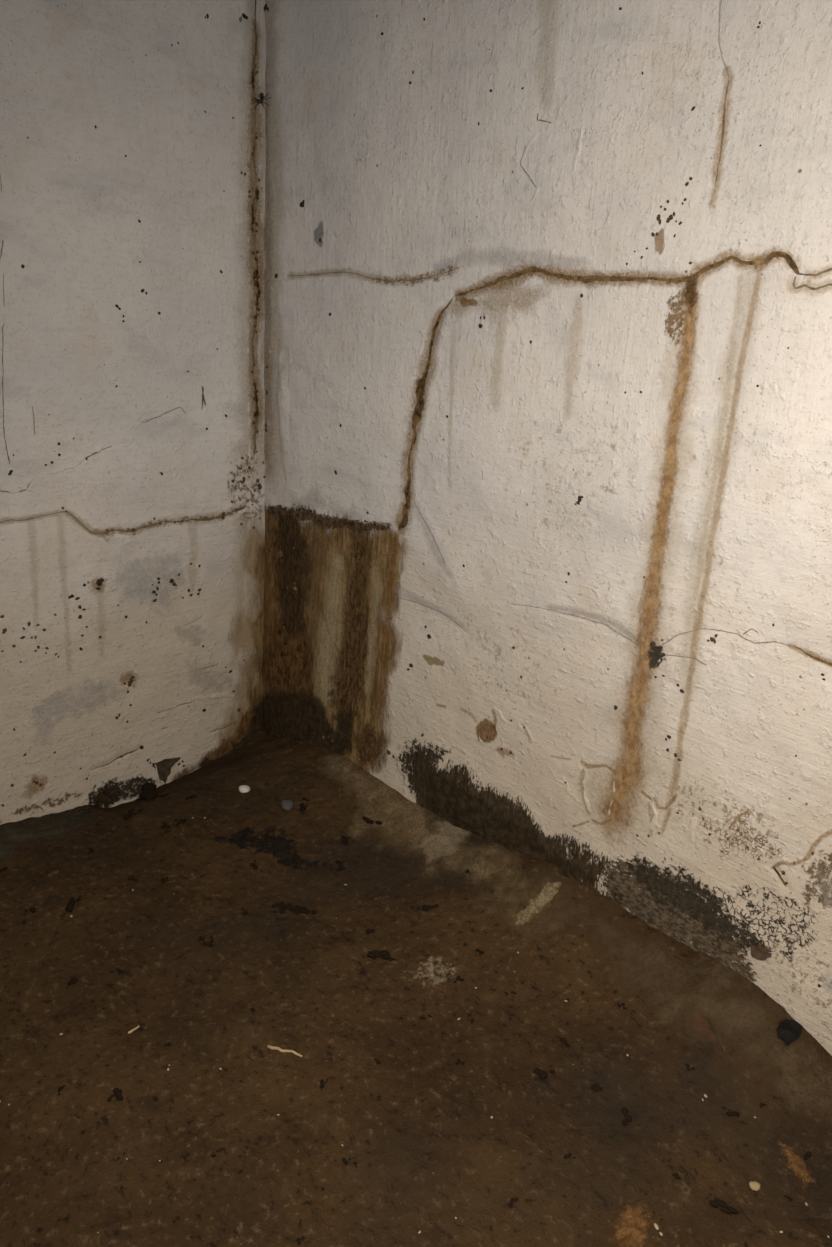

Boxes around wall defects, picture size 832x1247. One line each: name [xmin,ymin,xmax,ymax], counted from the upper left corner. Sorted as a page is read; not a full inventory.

crack [248,0,832,530]
rust [626,177,693,265]
crack [0,506,248,536]
damp [80,529,265,808]
rust [603,261,697,833]
rust [671,386,738,790]
crack [660,628,832,681]
damp [395,737,817,986]